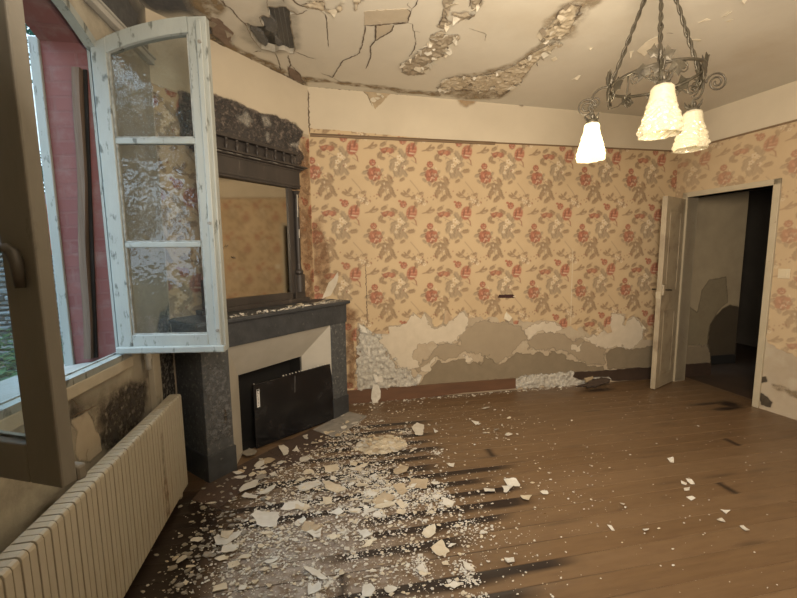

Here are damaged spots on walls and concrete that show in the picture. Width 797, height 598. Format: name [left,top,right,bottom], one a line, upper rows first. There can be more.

peeling [209,17,234,48]
peeling [287,67,306,84]
crack [245,0,418,134]
peeling [353,0,411,41]
peeling [399,0,482,76]
peeling [436,4,582,95]
damp [101,383,145,450]
peeling [355,312,469,408]
flaking render [516,371,611,389]
peeling [571,314,643,352]
peeling [687,277,728,347]
flaking render [760,393,772,407]